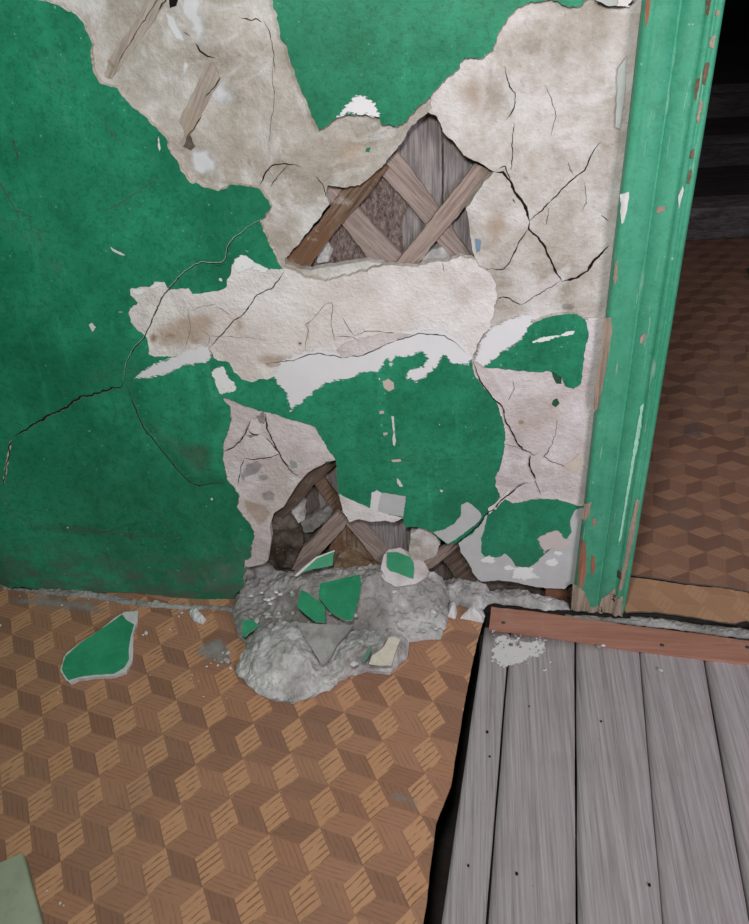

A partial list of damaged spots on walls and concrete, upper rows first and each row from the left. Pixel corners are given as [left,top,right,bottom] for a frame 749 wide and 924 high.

crack [3,219,261,486]
crack [209,272,284,358]
flaking render [51,0,651,617]
crack [490,142,608,305]